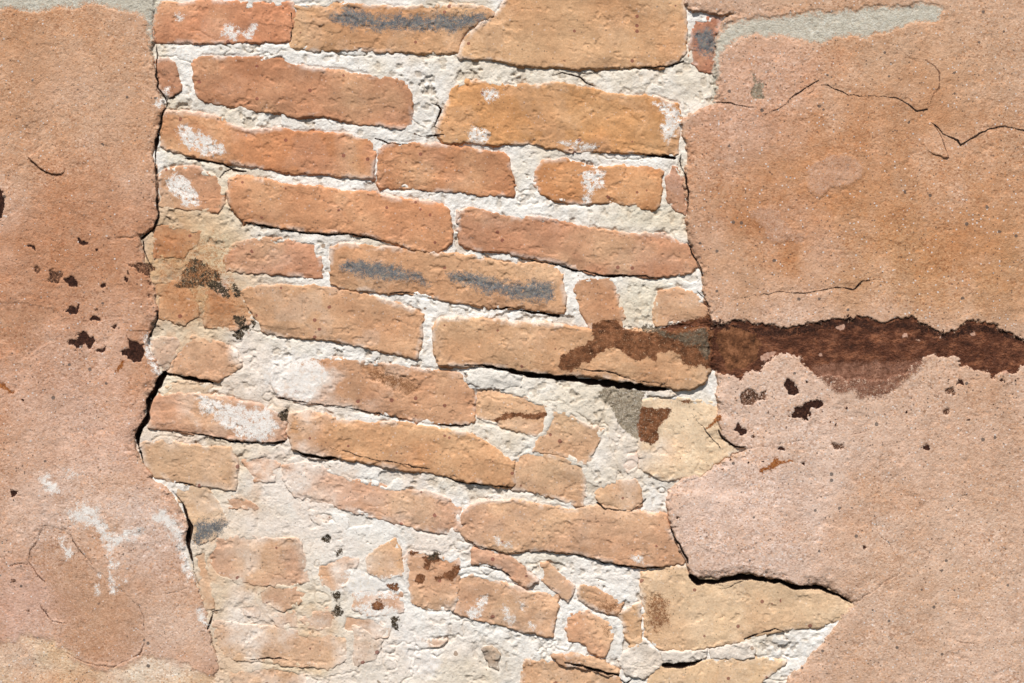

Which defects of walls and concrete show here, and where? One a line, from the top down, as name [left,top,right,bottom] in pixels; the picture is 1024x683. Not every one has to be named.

flaking render [709,1,944,106]
crack [715,79,1024,146]
leakage [175,258,241,299]
crack [733,279,881,301]
leakage [232,315,256,342]
leakage [559,313,714,373]
spalling [361,364,421,396]
crack [135,371,214,463]
crack [67,481,221,668]
crack [671,485,901,604]